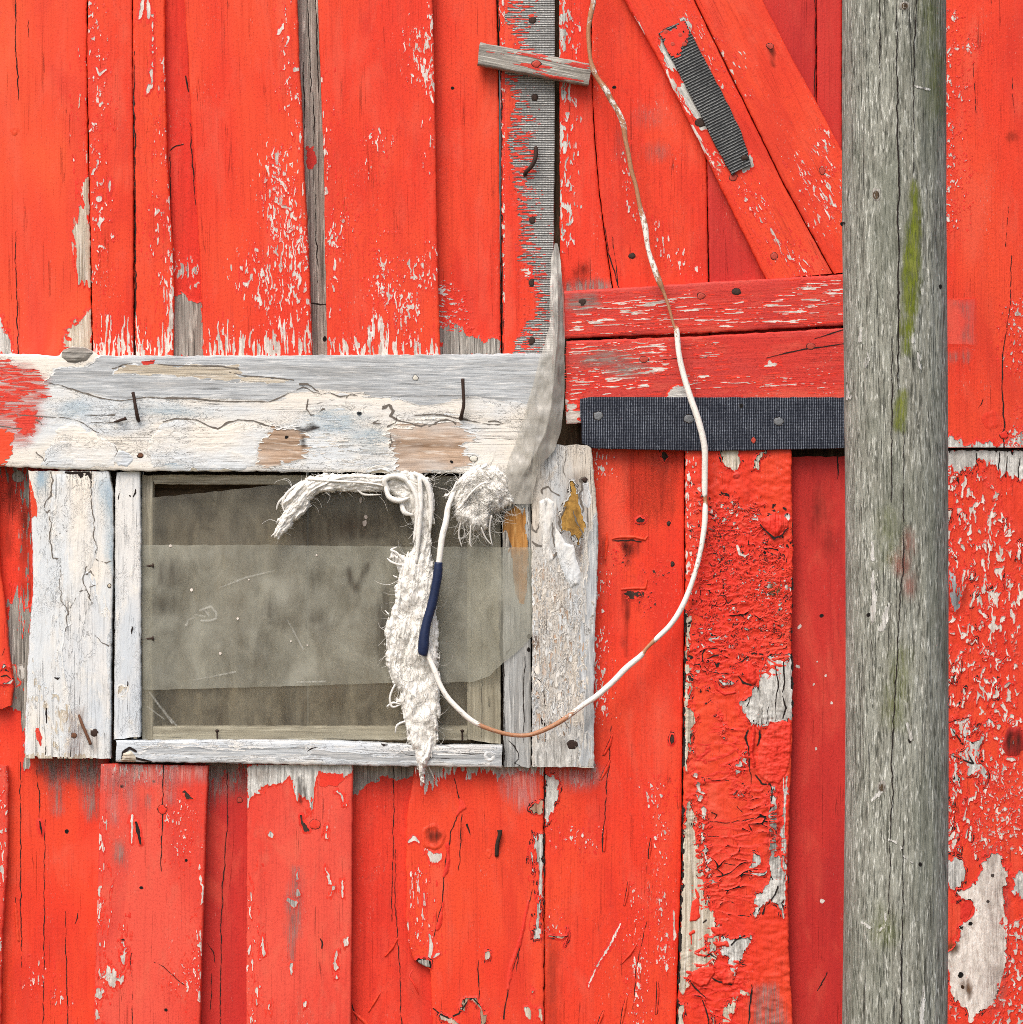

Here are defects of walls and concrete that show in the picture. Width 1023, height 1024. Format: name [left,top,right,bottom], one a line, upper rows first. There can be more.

crack [1,364,357,456]
peeling [34,0,546,474]
peeling [0,449,802,1024]
crack [372,404,504,448]
peeling [564,0,852,424]
crack [683,518,793,1024]
peeling [946,4,993,250]
peeling [948,280,1023,1024]